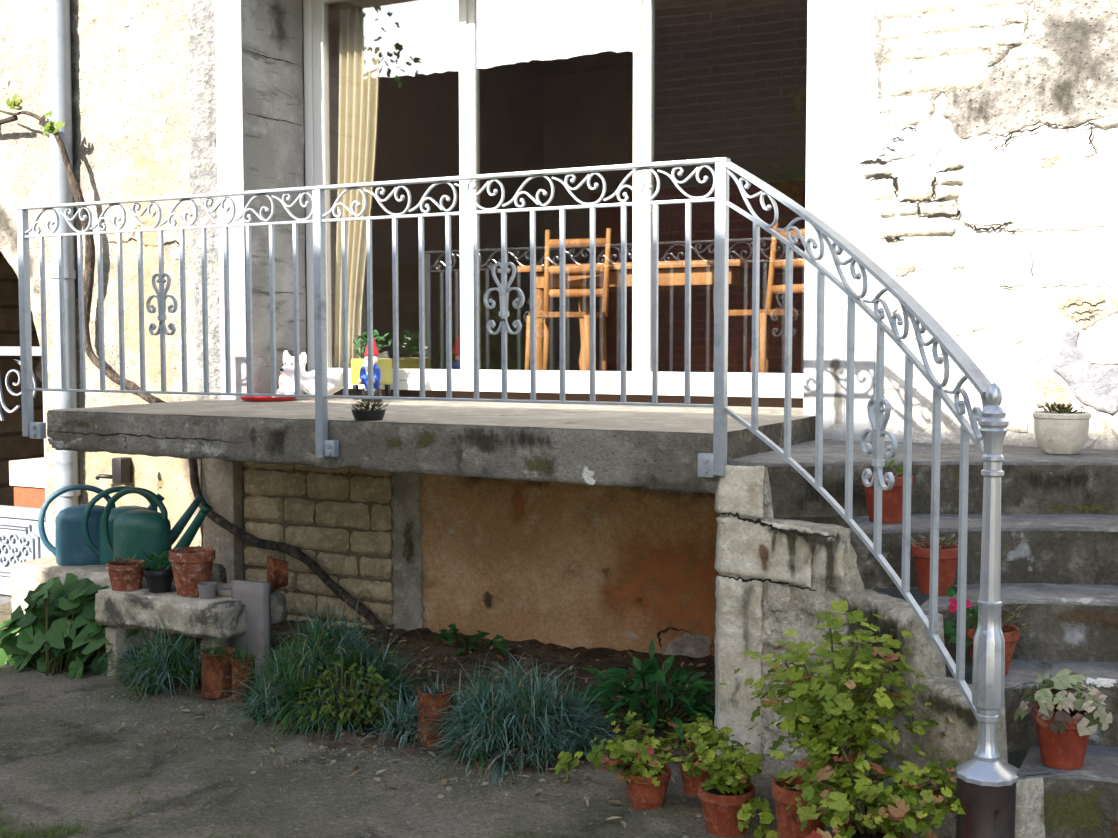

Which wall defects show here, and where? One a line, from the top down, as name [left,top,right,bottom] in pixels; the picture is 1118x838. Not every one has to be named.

damp [1061,22,1103,87]
flaking render [859,0,1118,276]
crack [983,122,1097,150]
peeling [882,296,900,312]
damp [455,429,549,462]
crack [719,512,835,538]
corrosion [604,544,719,642]
crack [719,575,816,591]